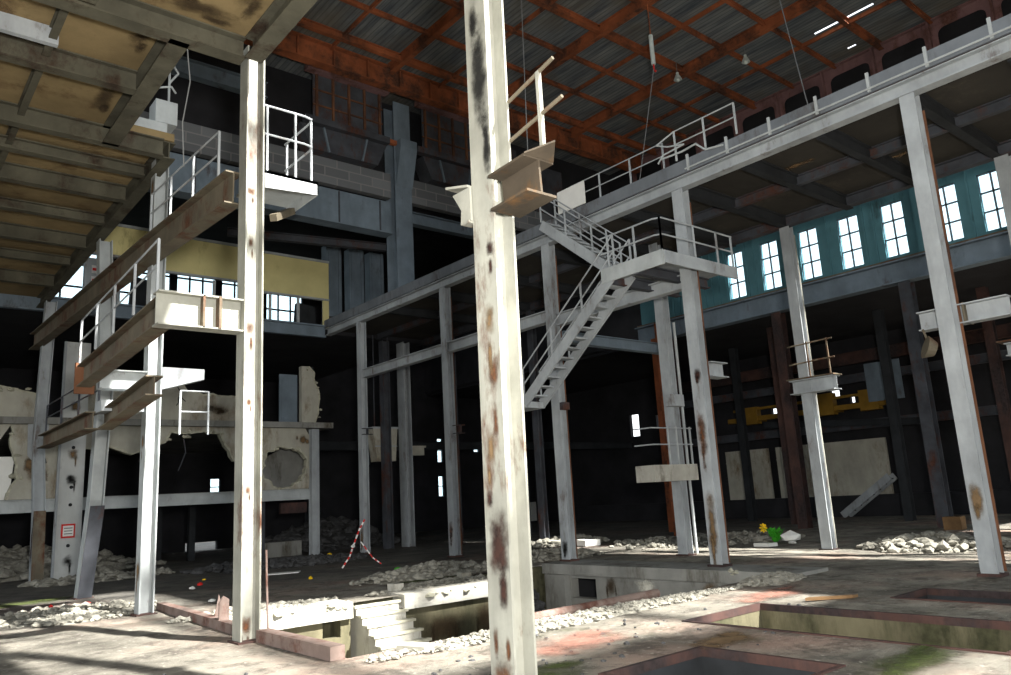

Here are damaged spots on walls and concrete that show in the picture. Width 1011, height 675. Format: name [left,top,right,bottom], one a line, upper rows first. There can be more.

leakage [176,0,226,25]
corrosion [922,110,1007,571]
corrosion [488,345,497,385]
spalling [0,385,36,396]
corrosion [489,410,498,458]
corrosion [695,270,730,565]
corrosion [492,516,507,605]
corrosion [494,633,511,675]